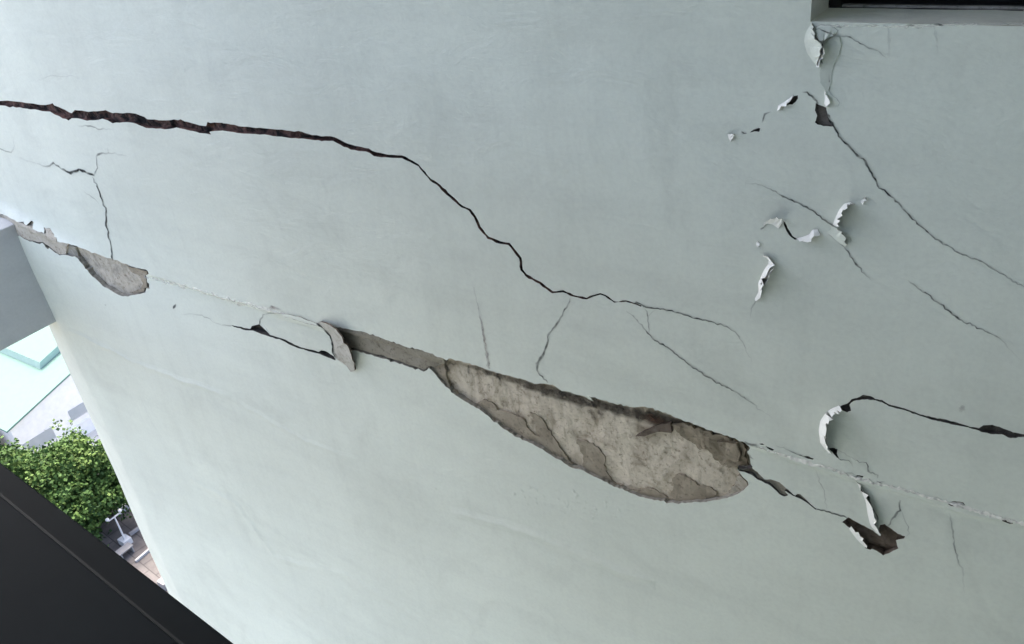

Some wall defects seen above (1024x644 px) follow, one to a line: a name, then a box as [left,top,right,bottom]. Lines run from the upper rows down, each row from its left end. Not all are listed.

peeling [777,95,798,111]
peeling [804,23,841,107]
crack [806,92,982,262]
flaking render [0,214,149,297]
crack [0,101,732,391]
peeling [755,241,775,301]
peeling [761,196,867,267]
flaking render [317,321,1024,555]
crack [819,395,1024,473]
crack [737,465,846,518]